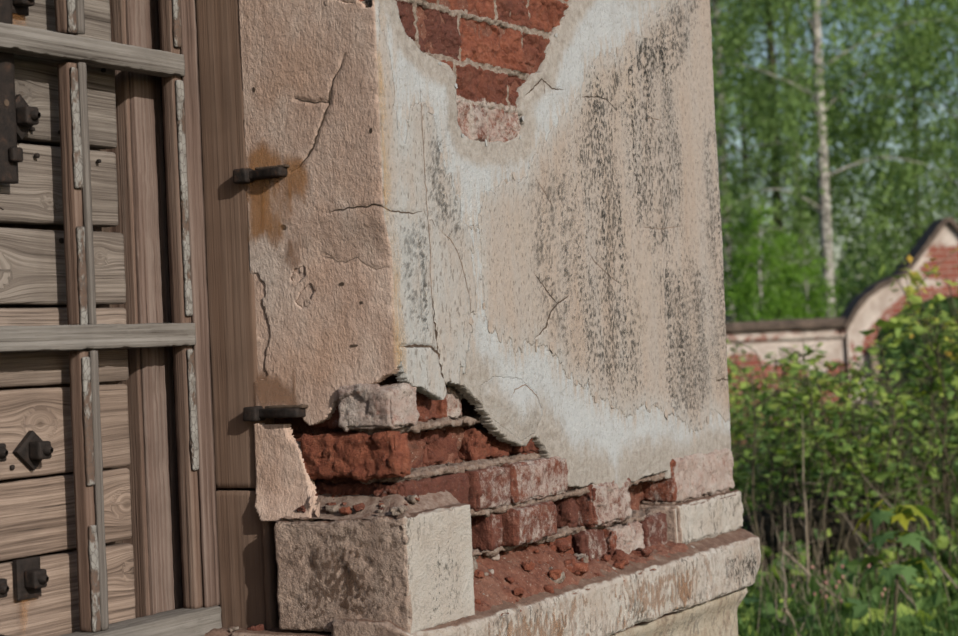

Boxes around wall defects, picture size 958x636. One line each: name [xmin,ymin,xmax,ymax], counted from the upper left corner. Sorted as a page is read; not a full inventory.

flaking render [251,270,270,376]
rust [249,146,306,236]
crack [291,56,344,172]
crack [322,77,471,385]
spalling [254,0,744,616]
leakage [524,0,729,425]